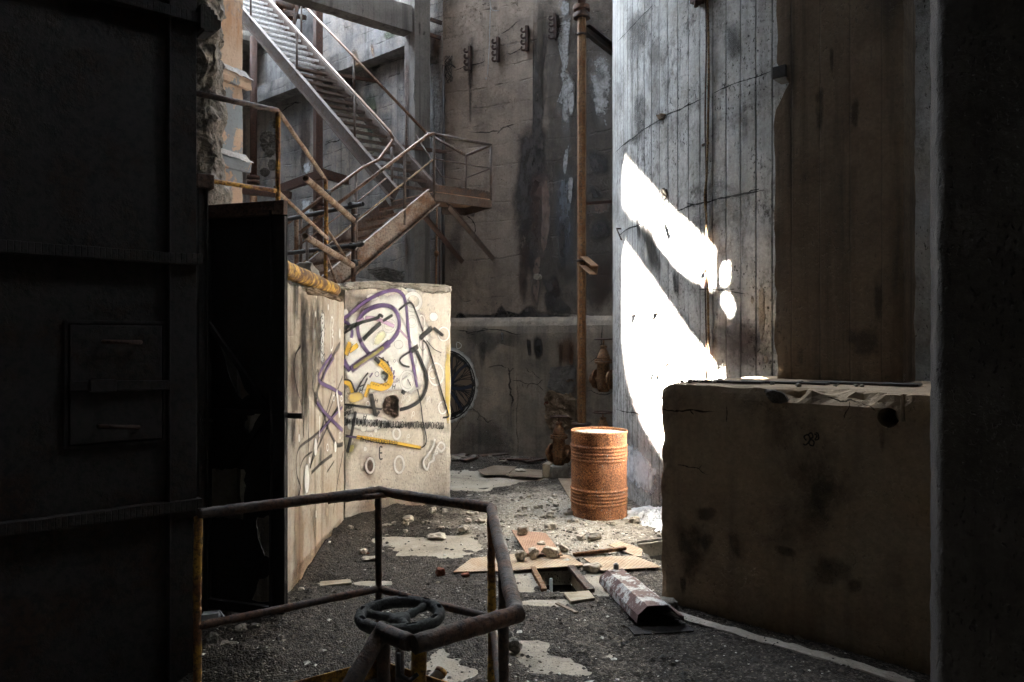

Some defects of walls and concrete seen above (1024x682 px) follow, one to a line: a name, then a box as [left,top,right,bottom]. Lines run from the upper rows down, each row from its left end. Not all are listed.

crack [617,72,768,151]
damp [456,0,574,318]
crack [673,189,765,213]
crack [490,365,543,405]
spalling [764,389,789,404]